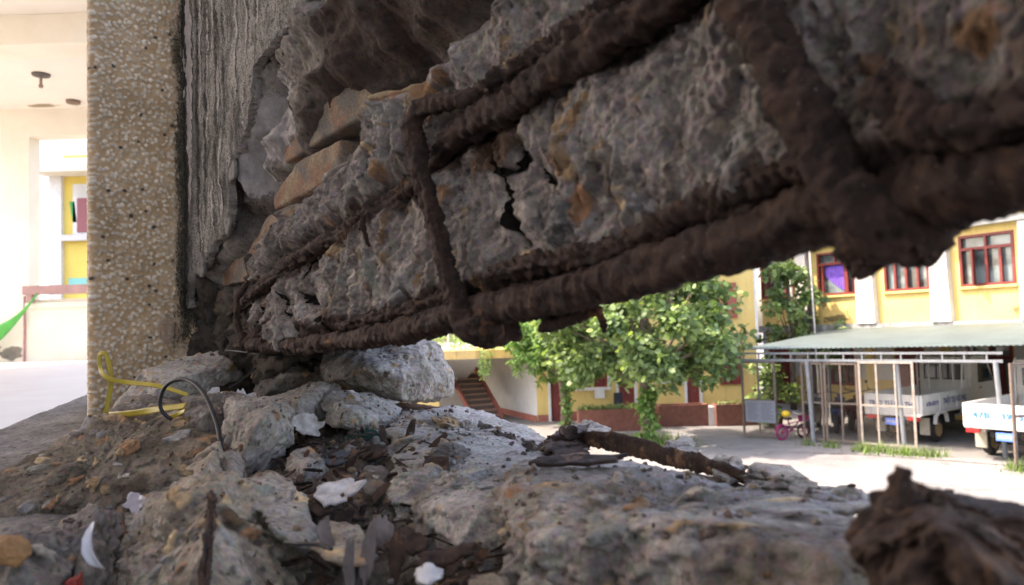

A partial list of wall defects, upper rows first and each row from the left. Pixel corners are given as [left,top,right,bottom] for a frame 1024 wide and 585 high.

corrosion [467,0,626,96]
spalling [214,71,372,316]
corrosion [470,123,525,181]
crack [489,150,558,247]
spalling [529,193,574,244]
corrosion [486,156,807,283]
corrosion [853,60,1024,154]
corrosion [335,290,444,331]
corrosion [528,423,748,484]